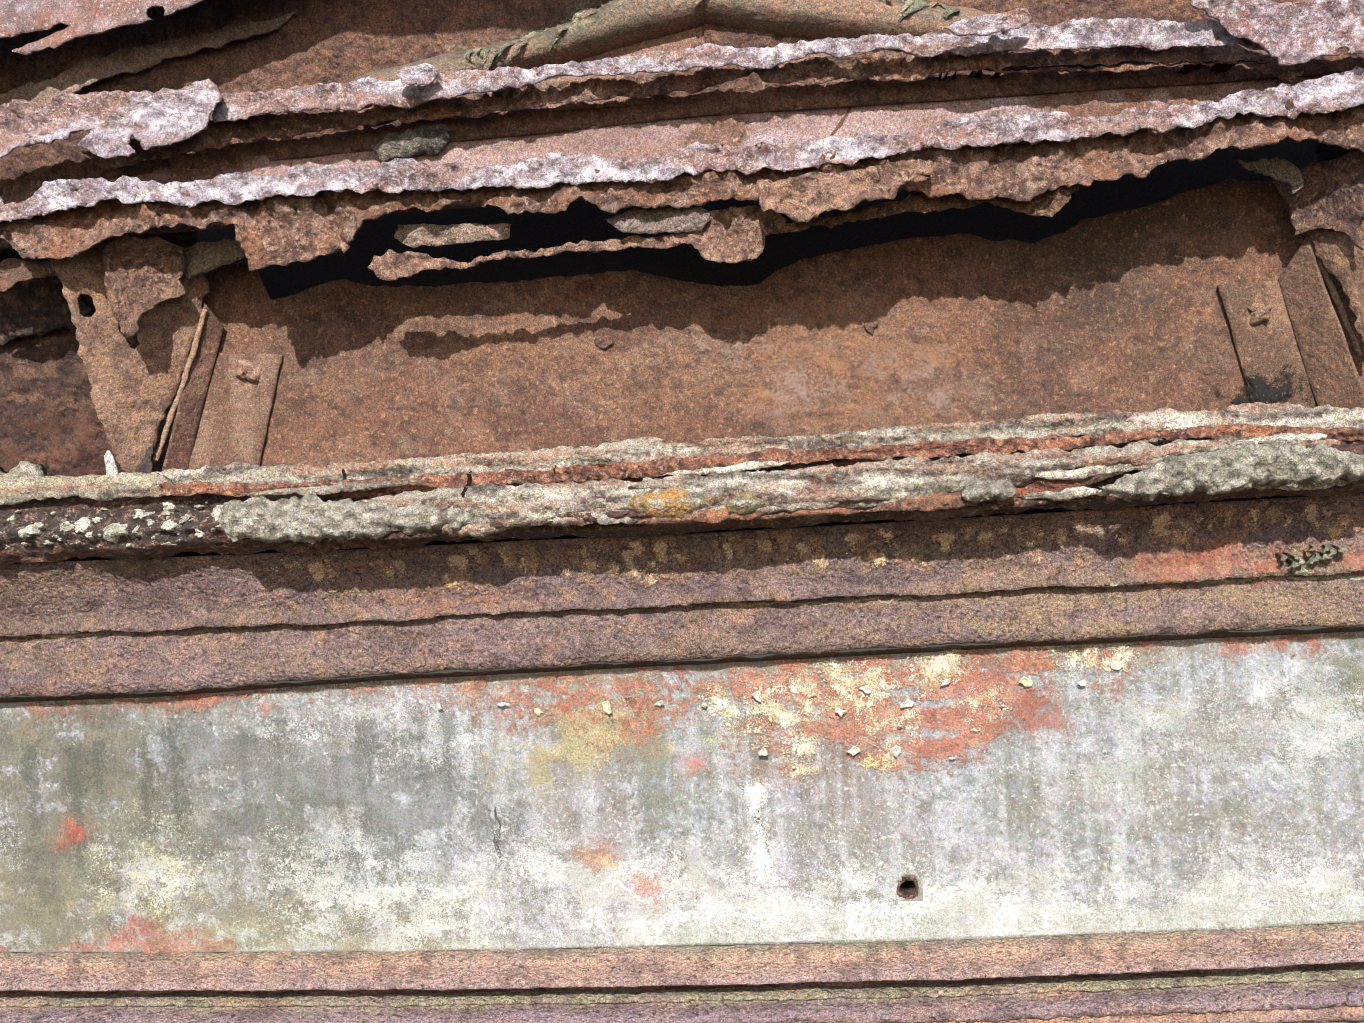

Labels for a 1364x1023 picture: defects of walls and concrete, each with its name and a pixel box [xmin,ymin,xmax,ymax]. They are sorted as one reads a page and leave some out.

corrosion [683,113,749,148]
peeling [1282,157,1364,250]
peeling [0,258,57,292]
peeling [101,236,246,344]
corrosion [0,262,1364,565]
leakage [1312,632,1364,771]
leakage [0,670,748,953]
leakage [739,776,783,892]